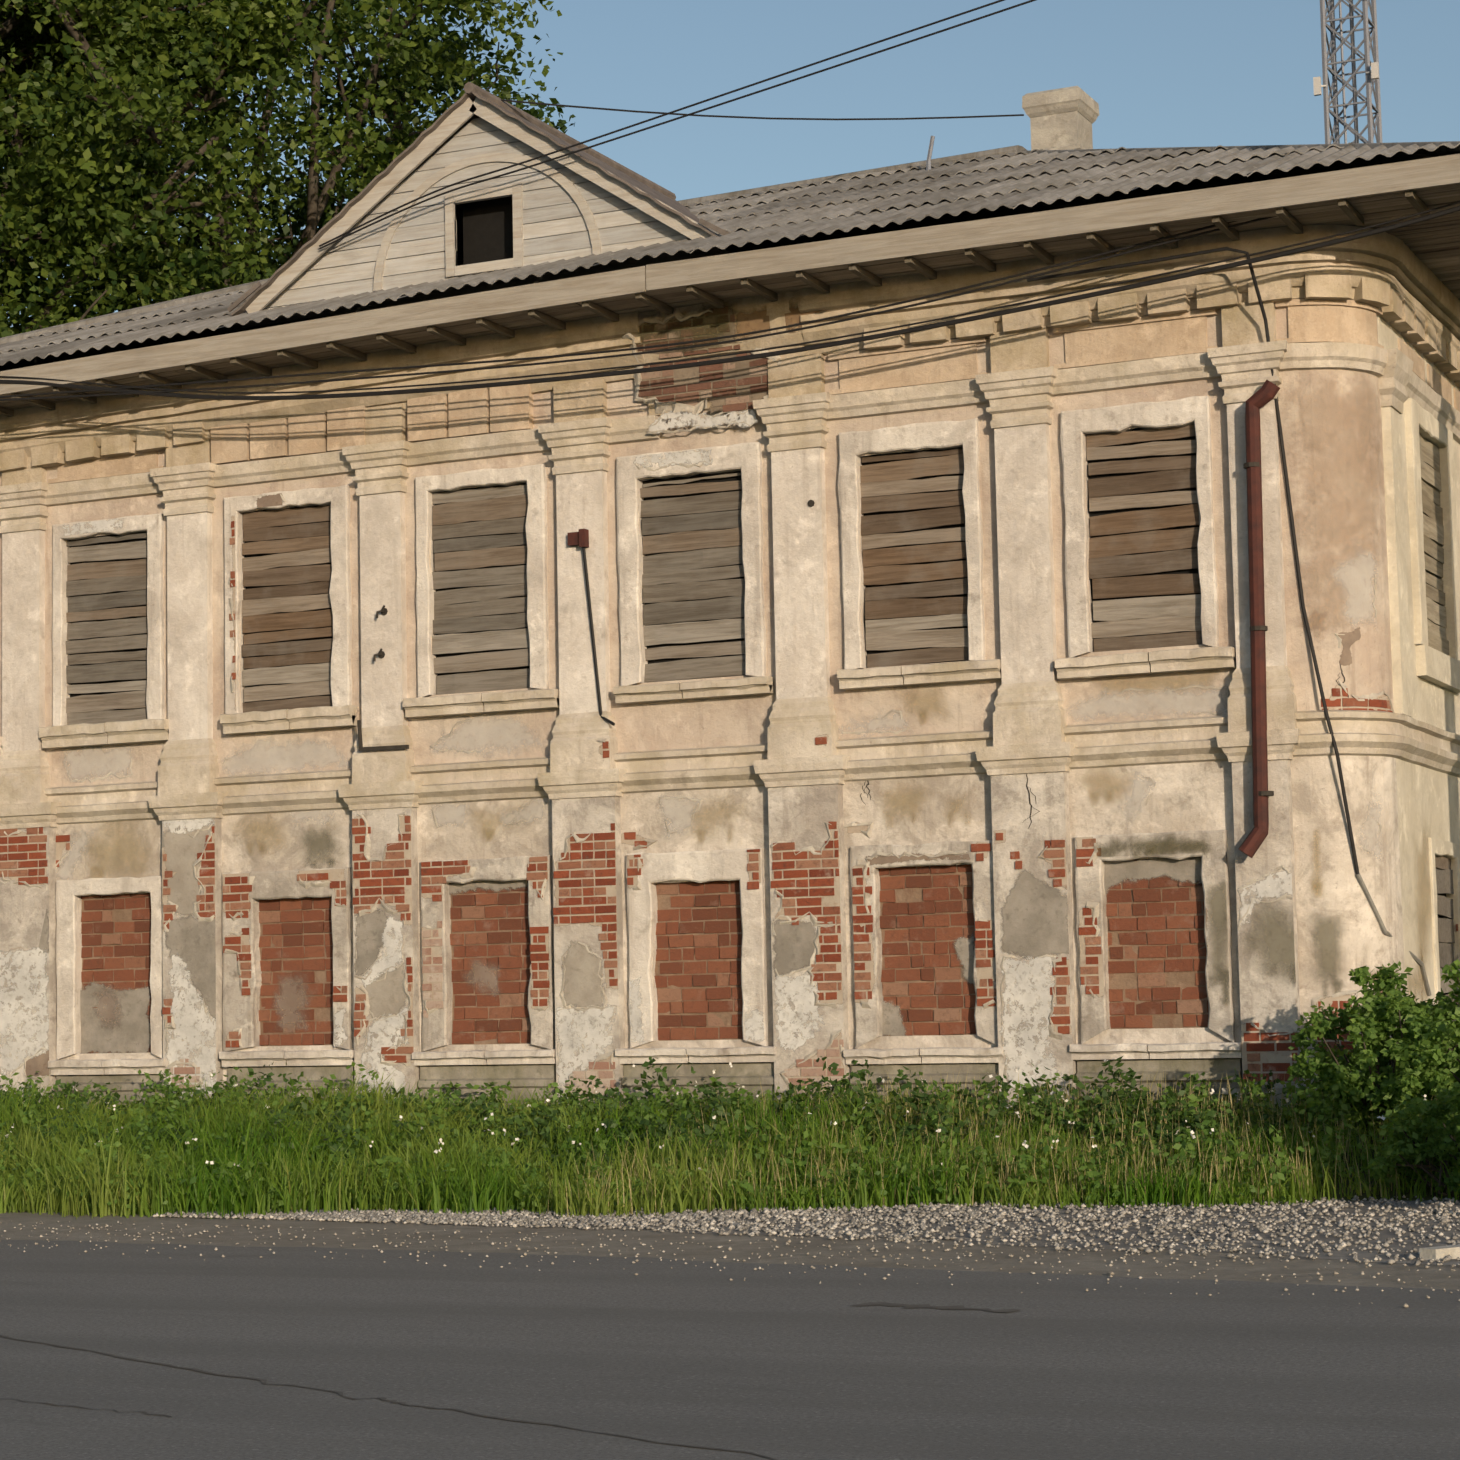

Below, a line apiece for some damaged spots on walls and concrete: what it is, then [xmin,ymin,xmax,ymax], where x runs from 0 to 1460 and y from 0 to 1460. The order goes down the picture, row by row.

flaking render [622,307,781,434]
peeling [633,449,713,471]
peeling [1321,555,1394,713]
flaking render [0,827,70,889]
peeling [162,955,243,1098]
peeling [162,818,255,997]
peeling [296,812,477,1101]
flaking render [526,795,702,1106]
peeling [745,821,1104,1102]
flaking render [1241,990,1361,1085]